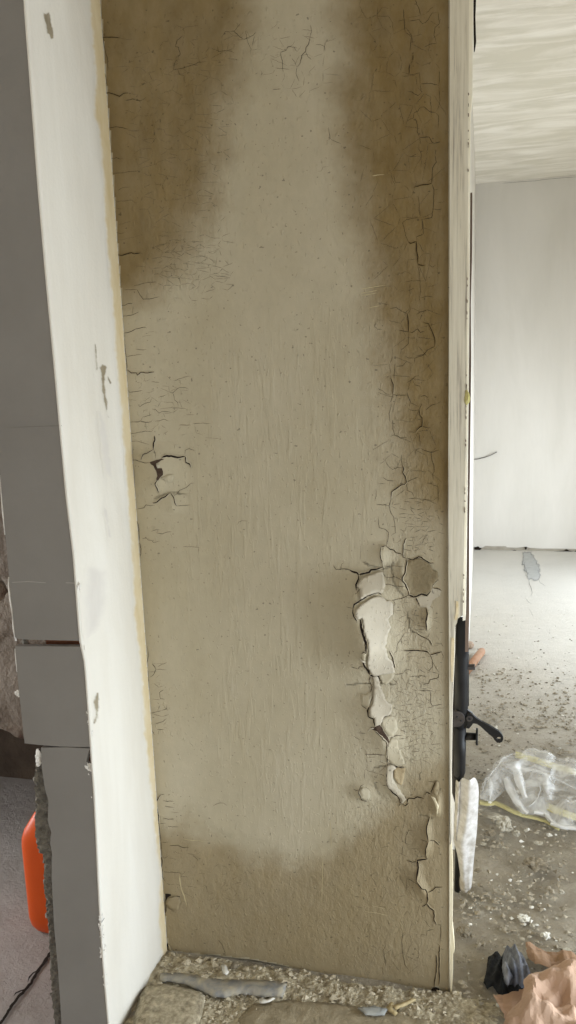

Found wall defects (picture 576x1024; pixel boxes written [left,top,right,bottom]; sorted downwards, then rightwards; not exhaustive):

water stain [89,0,448,992]
peeling [355,571,406,803]
crack [328,0,446,988]
peeling [404,558,441,610]